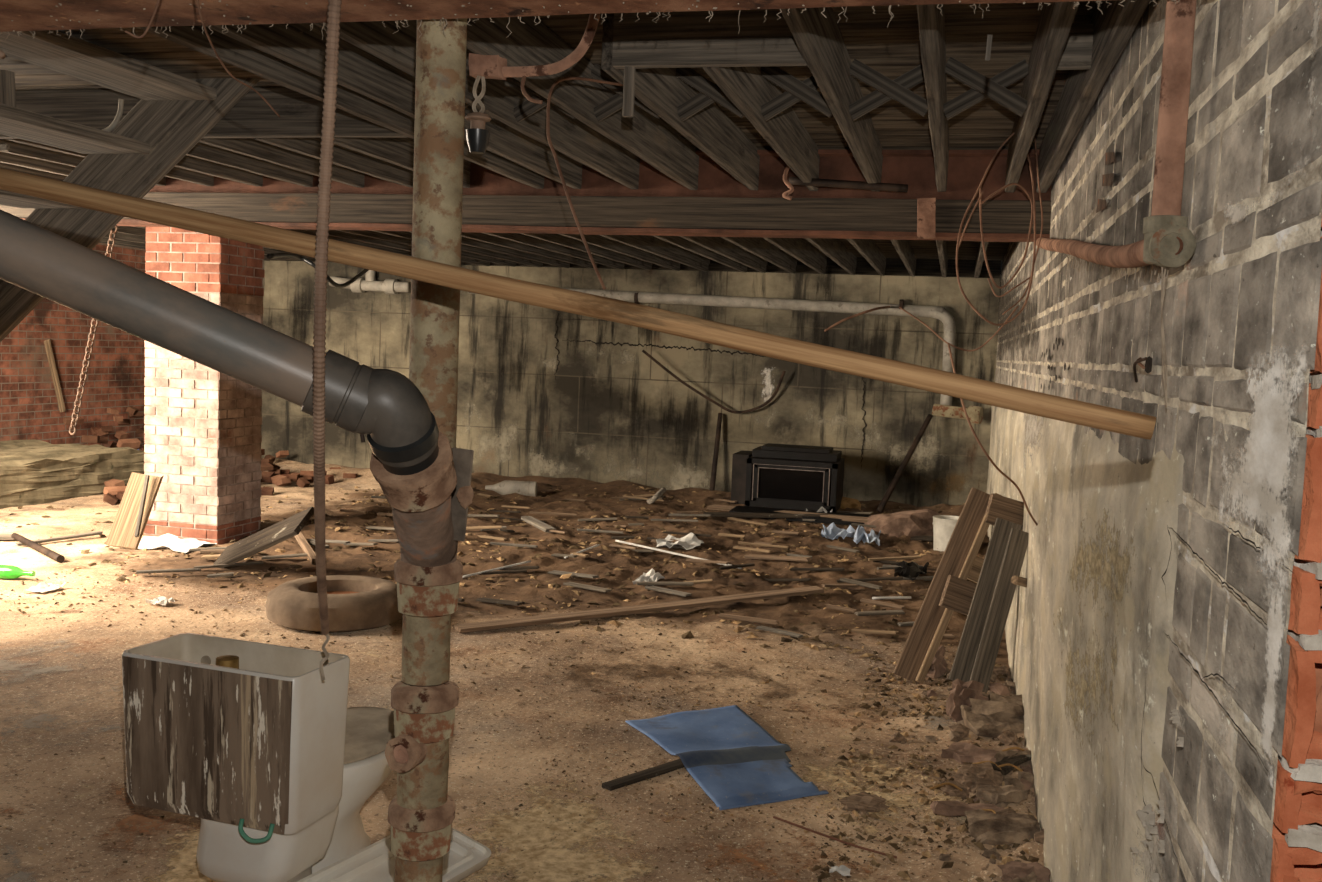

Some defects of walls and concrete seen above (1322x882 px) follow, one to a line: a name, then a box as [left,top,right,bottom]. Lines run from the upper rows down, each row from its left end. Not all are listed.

damp [761,367,775,402]
crack [1224,524,1293,573]
damp [1212,348,1307,786]